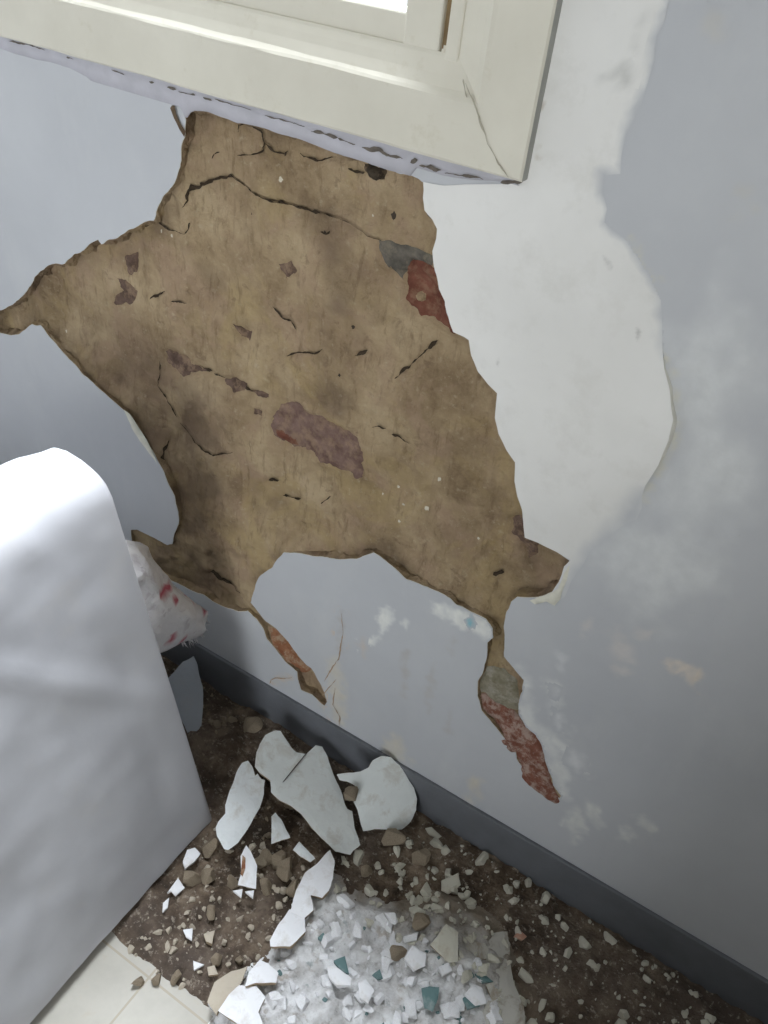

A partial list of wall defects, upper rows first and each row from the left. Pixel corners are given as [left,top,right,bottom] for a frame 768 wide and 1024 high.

crack [8,40,72,59]
crack [145,80,522,240]
spalling [0,0,677,737]
corrosion [267,670,298,690]
crack [269,615,343,724]